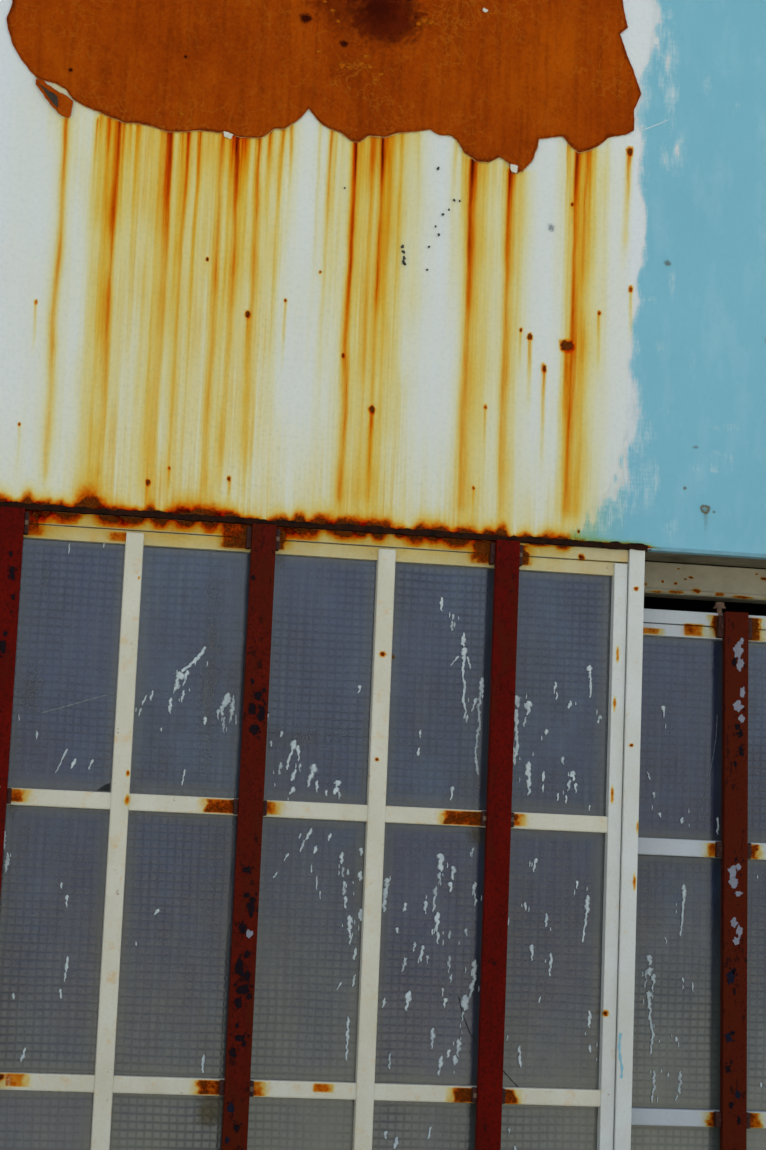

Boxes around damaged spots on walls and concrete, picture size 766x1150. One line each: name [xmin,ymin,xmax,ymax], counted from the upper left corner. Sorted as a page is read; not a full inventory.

corrosion [6,0,641,315]
corrosion [560,245,575,382]
corrosion [749,618,761,641]
corrosion [443,810,481,826]
corrosion [0,1074,23,1086]